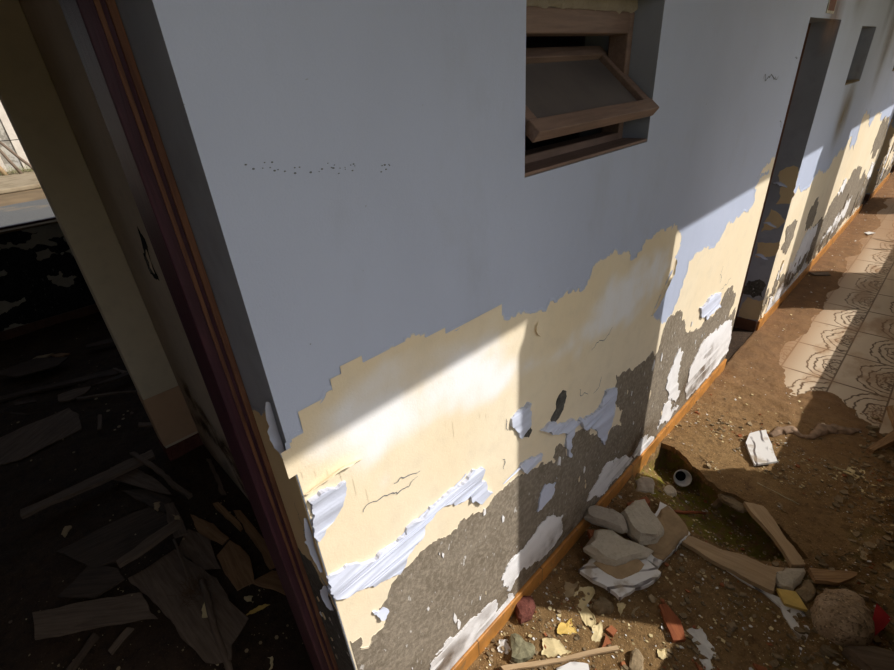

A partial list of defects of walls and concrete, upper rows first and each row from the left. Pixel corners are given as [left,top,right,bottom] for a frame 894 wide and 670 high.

peeling [251,108,894,670]